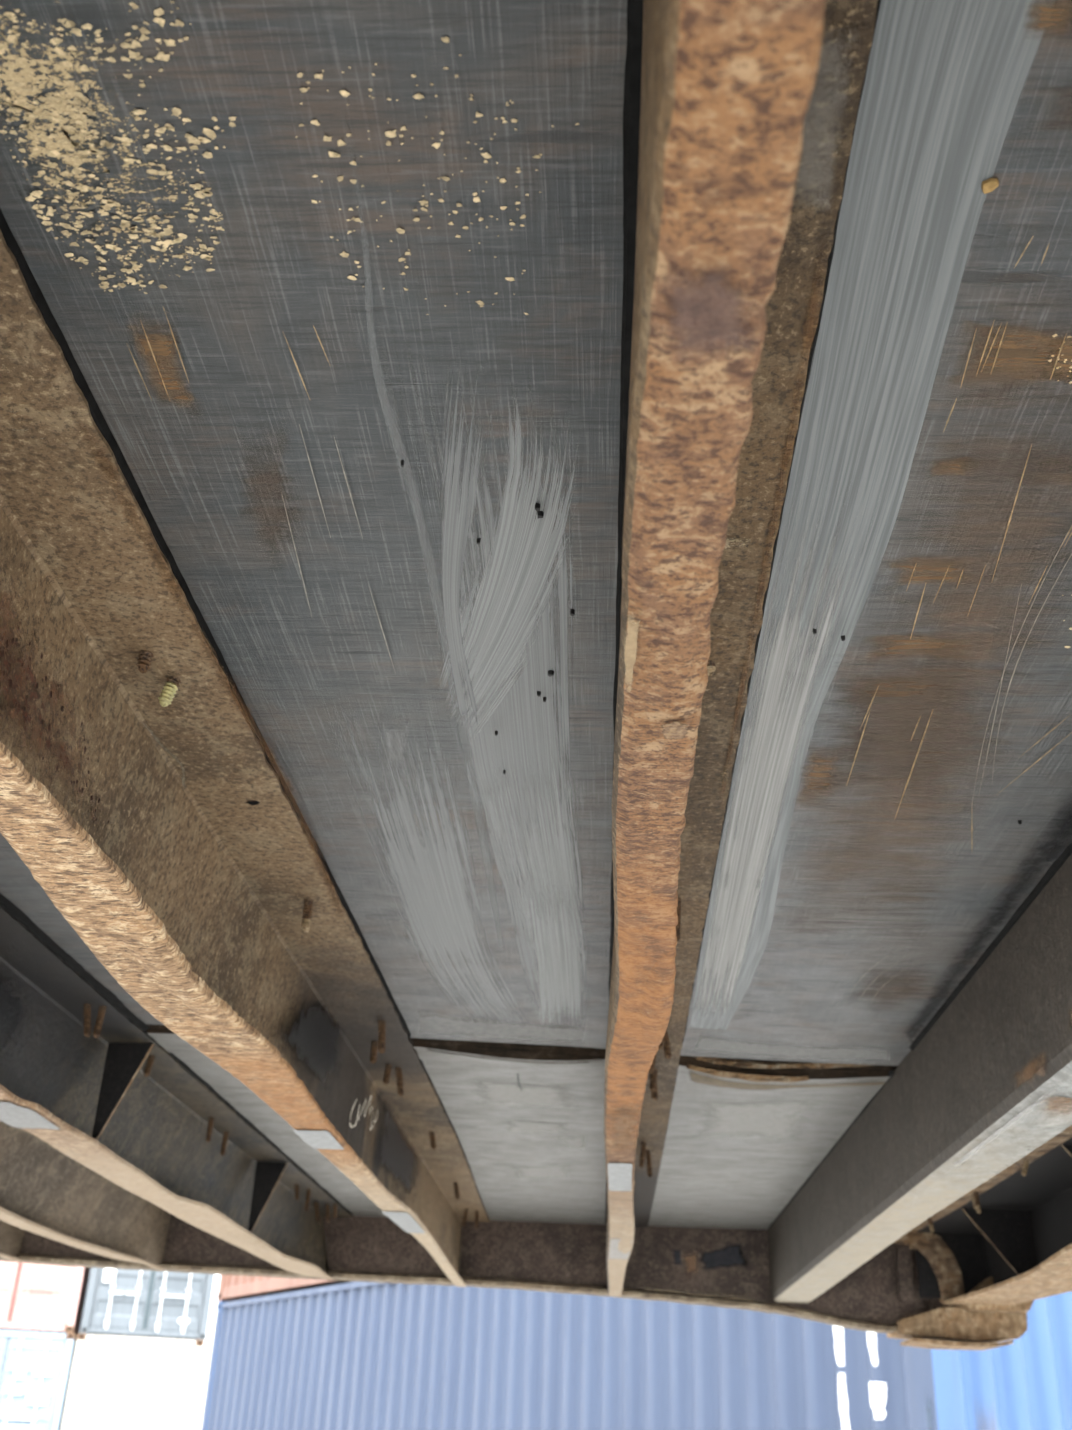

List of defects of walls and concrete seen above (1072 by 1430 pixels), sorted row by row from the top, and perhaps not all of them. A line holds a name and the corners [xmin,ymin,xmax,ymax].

peeling [297,70,350,105]
peeling [368,63,438,101]
peeling [0,1,236,294]
peeling [296,120,401,287]
peeling [368,122,414,161]
peeling [377,94,542,290]
peeling [127,307,192,401]